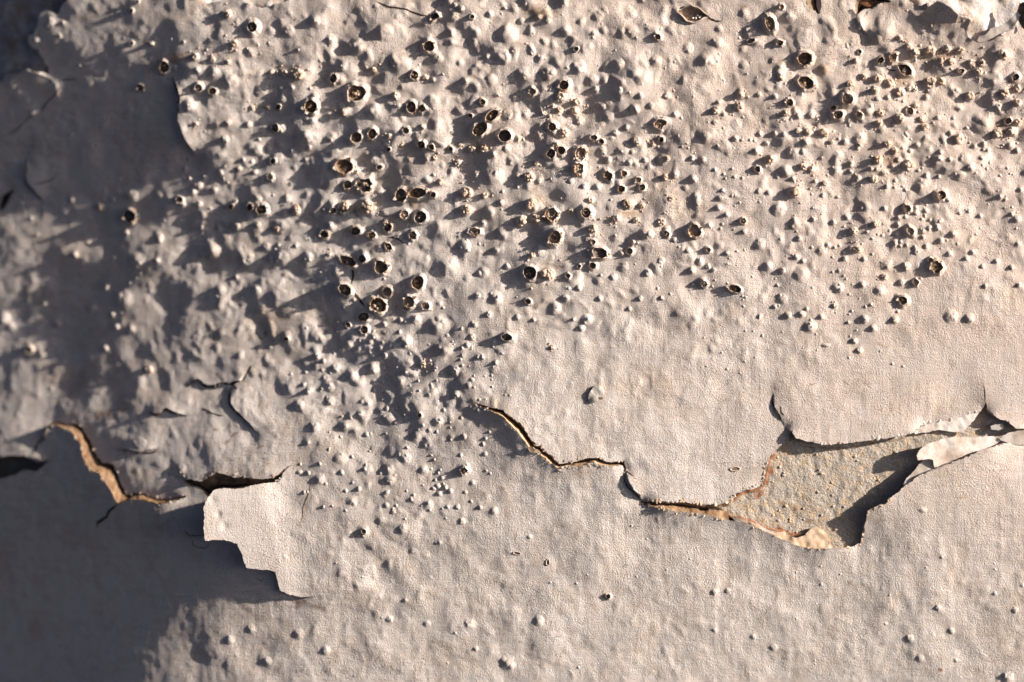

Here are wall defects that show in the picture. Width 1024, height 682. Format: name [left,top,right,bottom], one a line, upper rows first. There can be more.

crack [34,420,291,527]
crack [475,403,733,521]
peeling [625,474,642,495]
peeling [722,403,1024,551]